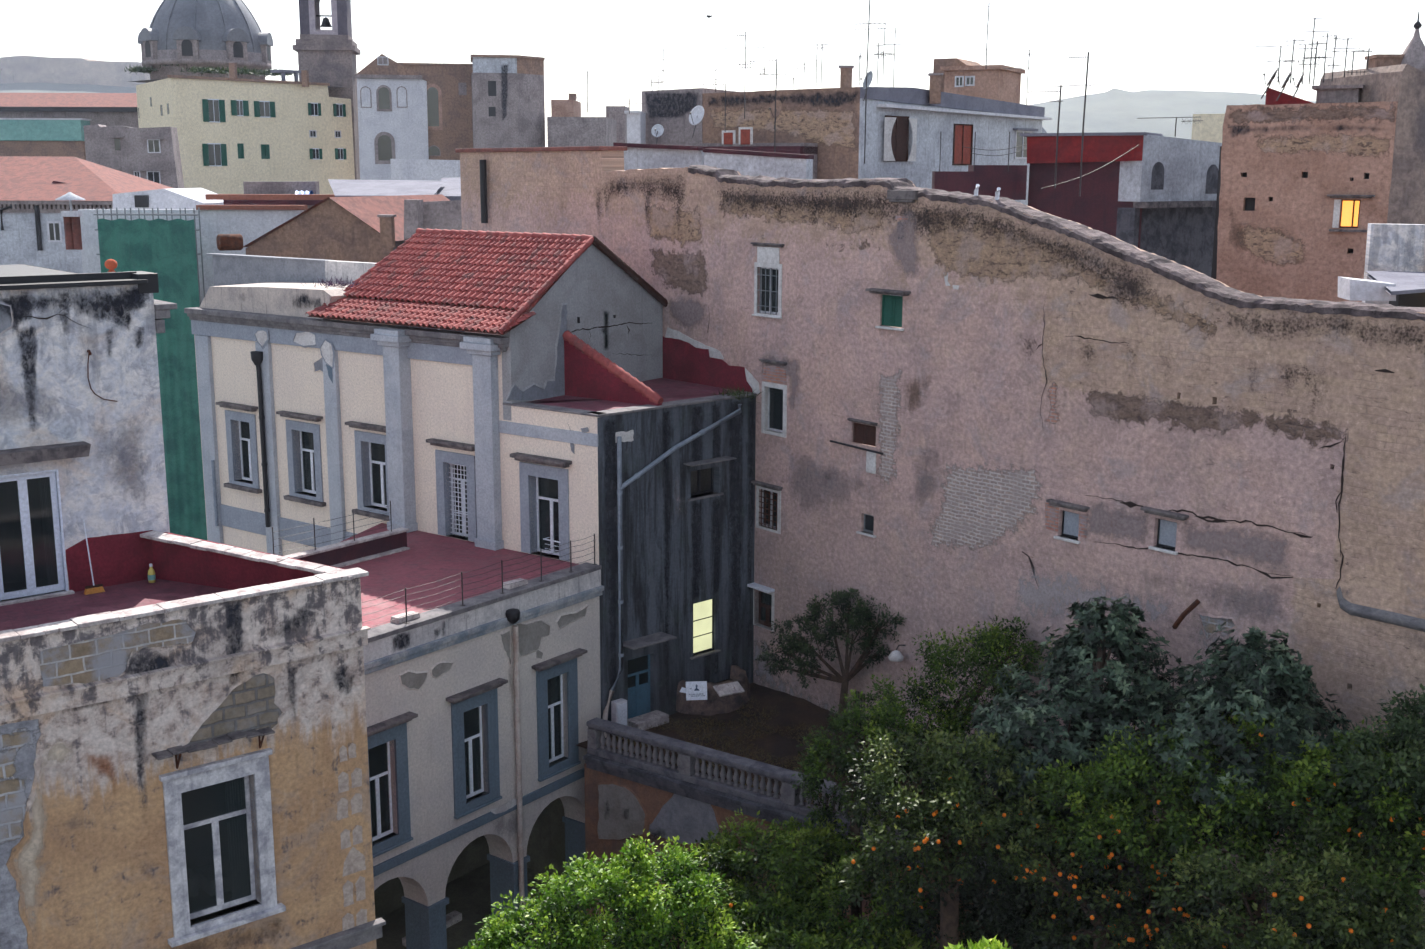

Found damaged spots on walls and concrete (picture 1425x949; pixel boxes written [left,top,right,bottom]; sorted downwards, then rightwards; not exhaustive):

water stain [0,288,144,420]
crack [1085,436,1346,588]
water stain [135,696,145,787]
water stain [129,654,170,674]
peeling [179,668,286,746]
water stain [227,601,242,654]
water stain [283,609,308,632]
water stain [335,666,352,692]
peeling [399,661,454,691]
peeling [0,714,49,949]